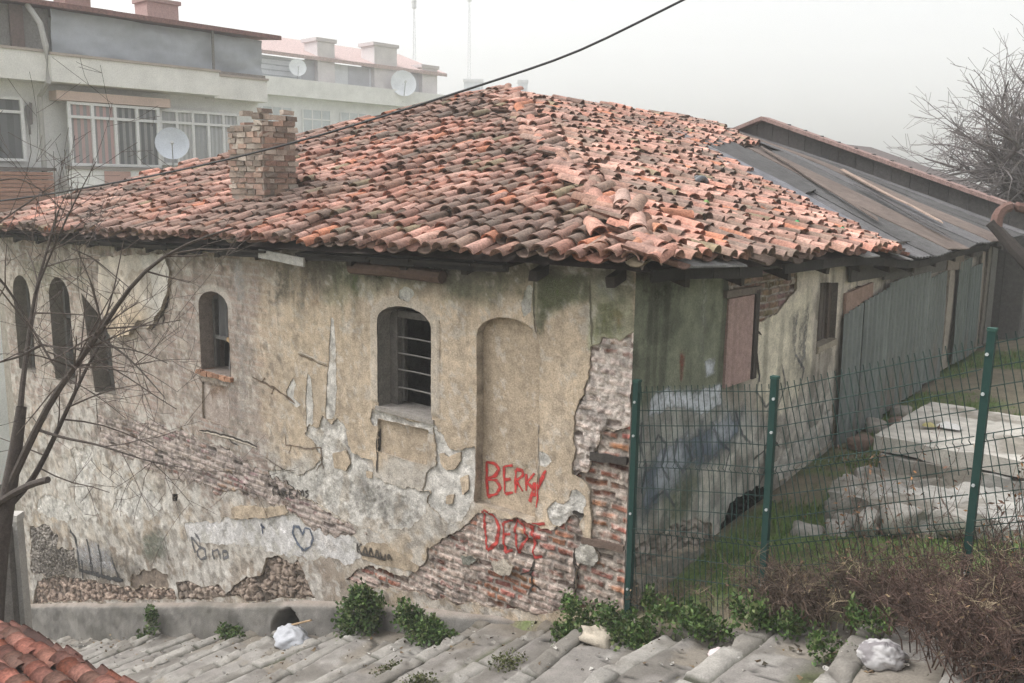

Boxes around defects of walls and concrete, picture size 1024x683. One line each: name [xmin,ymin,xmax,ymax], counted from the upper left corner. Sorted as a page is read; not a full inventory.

spalling [728,268,797,323]
spalling [30,318,764,616]